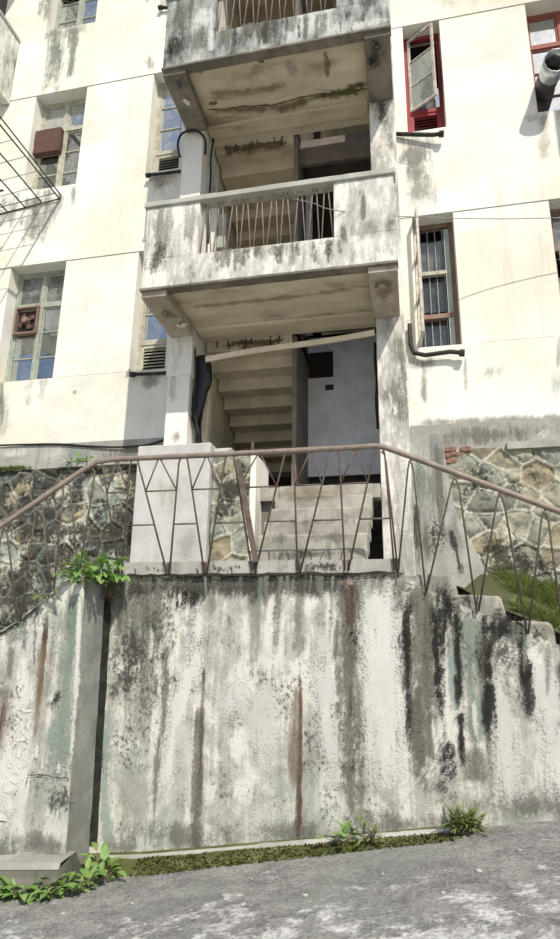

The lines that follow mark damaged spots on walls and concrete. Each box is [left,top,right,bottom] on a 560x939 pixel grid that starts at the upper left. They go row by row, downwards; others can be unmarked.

leakage [44,27,78,88]
leakage [164,0,386,58]
crack [207,88,368,113]
spalling [223,136,287,157]
leakage [148,241,172,273]
corrosion [293,588,305,657]
corrosion [34,615,48,734]
leakage [107,513,560,853]
corrosion [288,675,303,839]